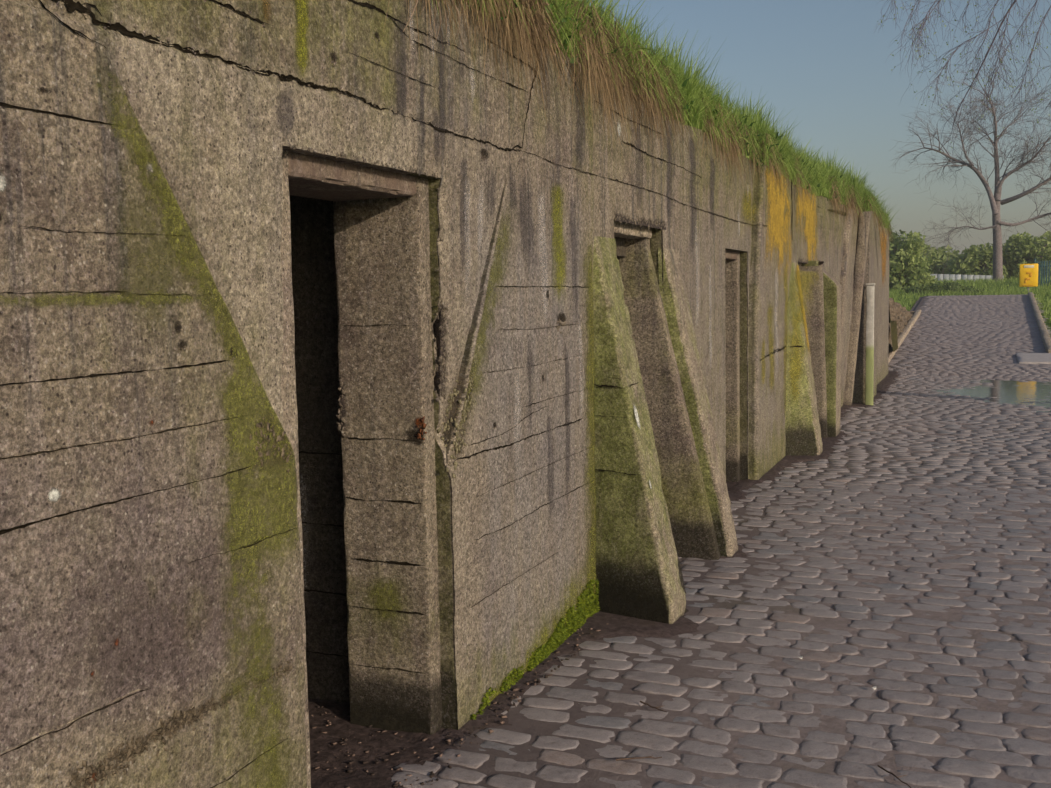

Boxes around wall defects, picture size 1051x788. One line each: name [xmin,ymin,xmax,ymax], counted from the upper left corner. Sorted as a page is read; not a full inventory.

crack [0,102,138,130]
crack [39,0,767,227]
leakage [552,187,566,294]
crack [1,360,229,385]
corrosion [407,416,427,445]
crack [454,377,638,461]
crack [0,465,253,535]
crack [476,449,635,540]